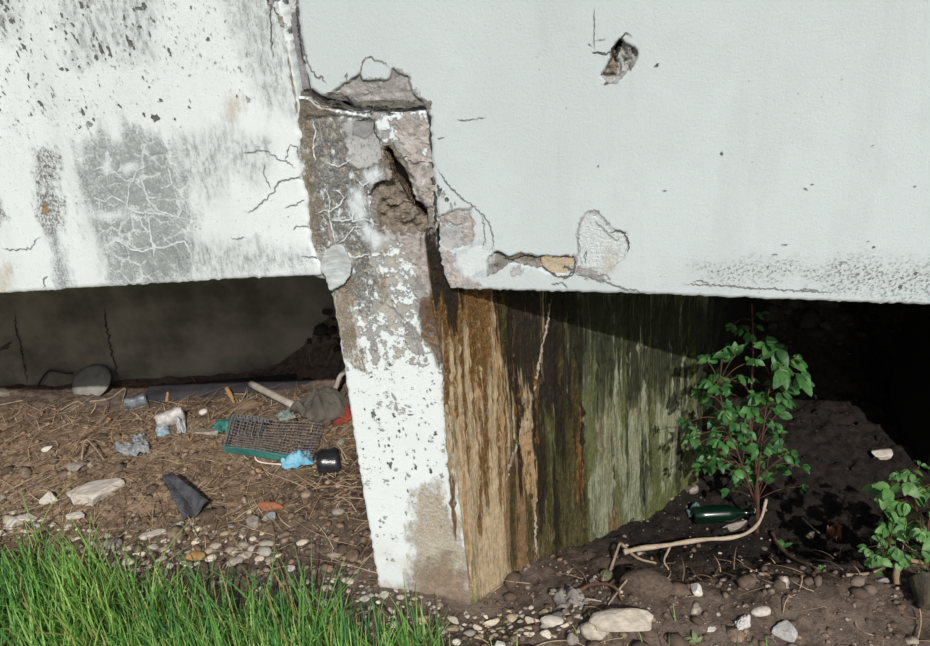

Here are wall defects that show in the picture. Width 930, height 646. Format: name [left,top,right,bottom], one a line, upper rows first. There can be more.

flaking render [588,7,638,84]
crack [267,0,494,283]
leakage [77,125,292,284]
crack [243,144,309,230]
leakage [807,259,930,301]
crack [0,313,28,383]
crack [104,310,118,379]
leakage [420,228,731,605]